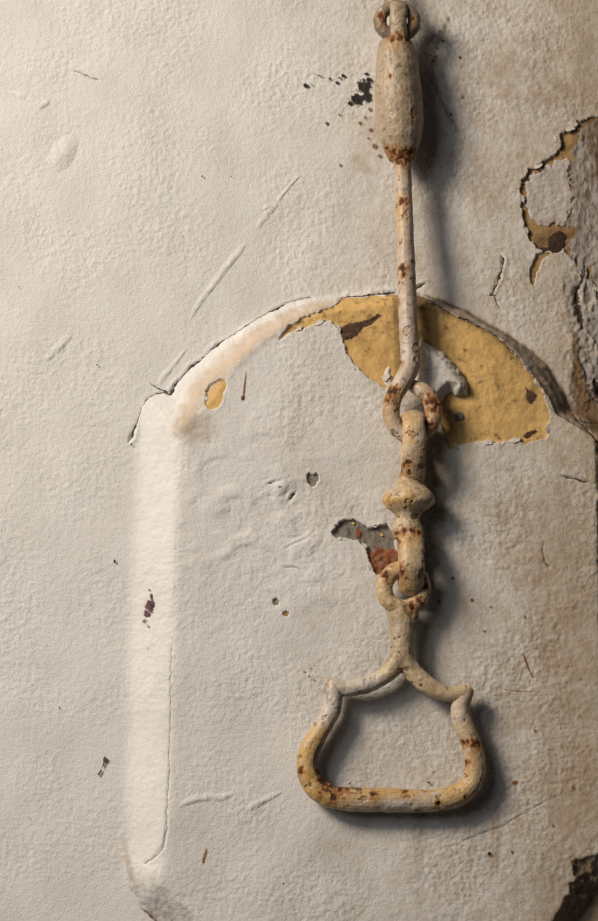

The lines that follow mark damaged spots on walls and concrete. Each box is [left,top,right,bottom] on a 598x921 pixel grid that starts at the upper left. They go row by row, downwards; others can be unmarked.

flaking render [519,117,598,291]
peeling [203,379,226,409]
crack [128,297,308,442]
peeling [279,294,401,388]
peeling [415,296,550,450]
flaking render [331,520,398,575]